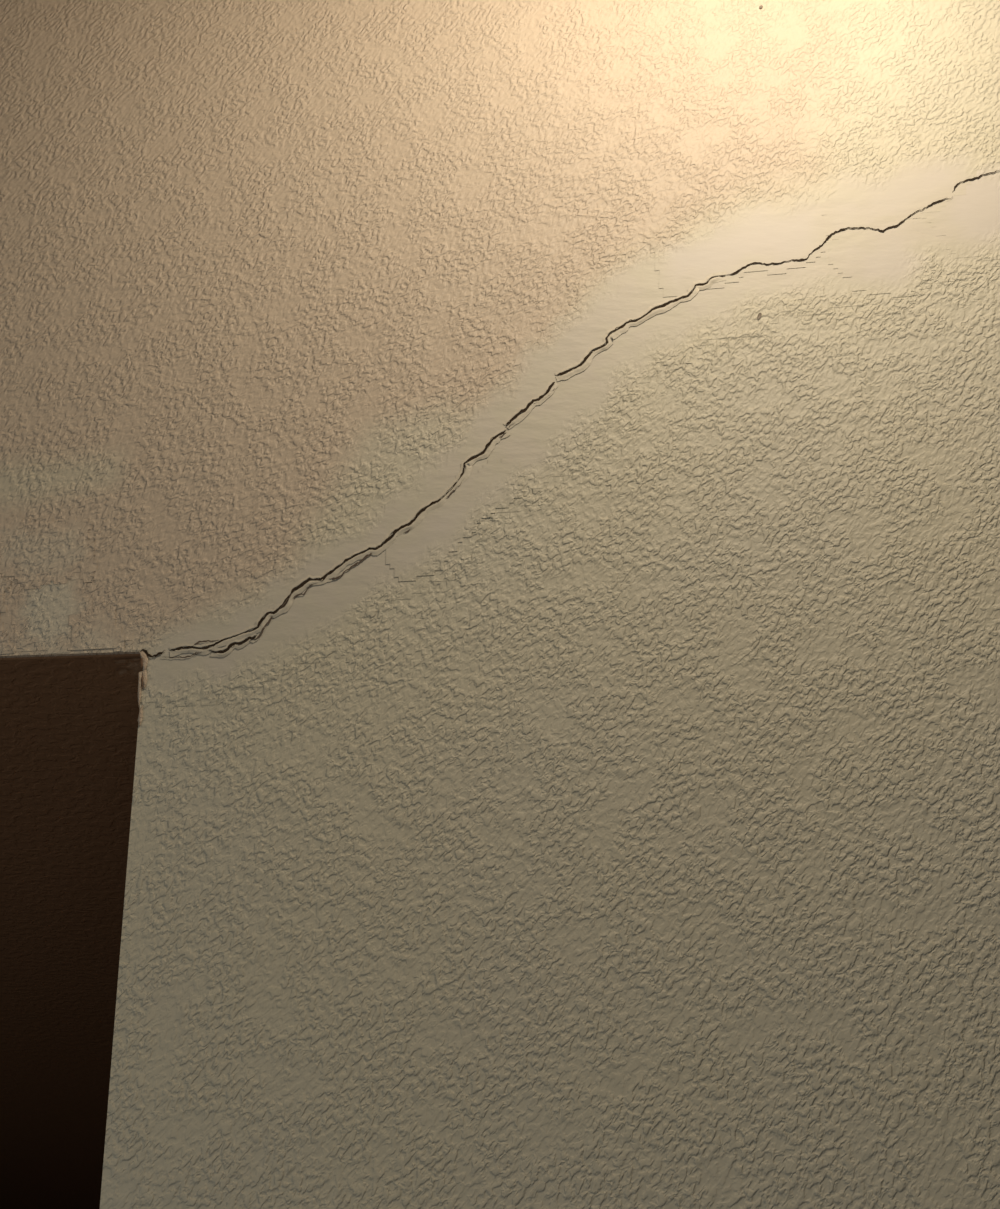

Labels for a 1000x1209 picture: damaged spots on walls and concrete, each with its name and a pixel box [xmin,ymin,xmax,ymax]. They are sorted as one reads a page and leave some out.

crack [140,170,999,658]